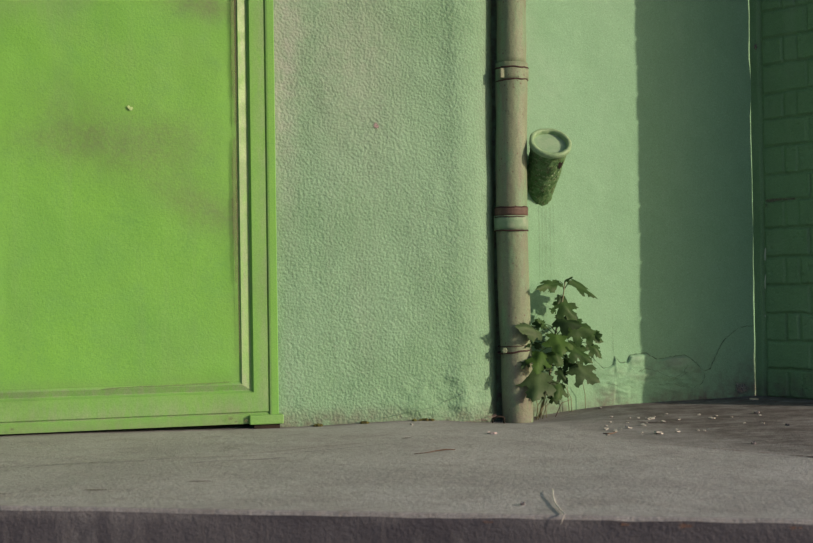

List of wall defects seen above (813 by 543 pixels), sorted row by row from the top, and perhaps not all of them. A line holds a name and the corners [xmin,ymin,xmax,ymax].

crack [593,326,746,390]